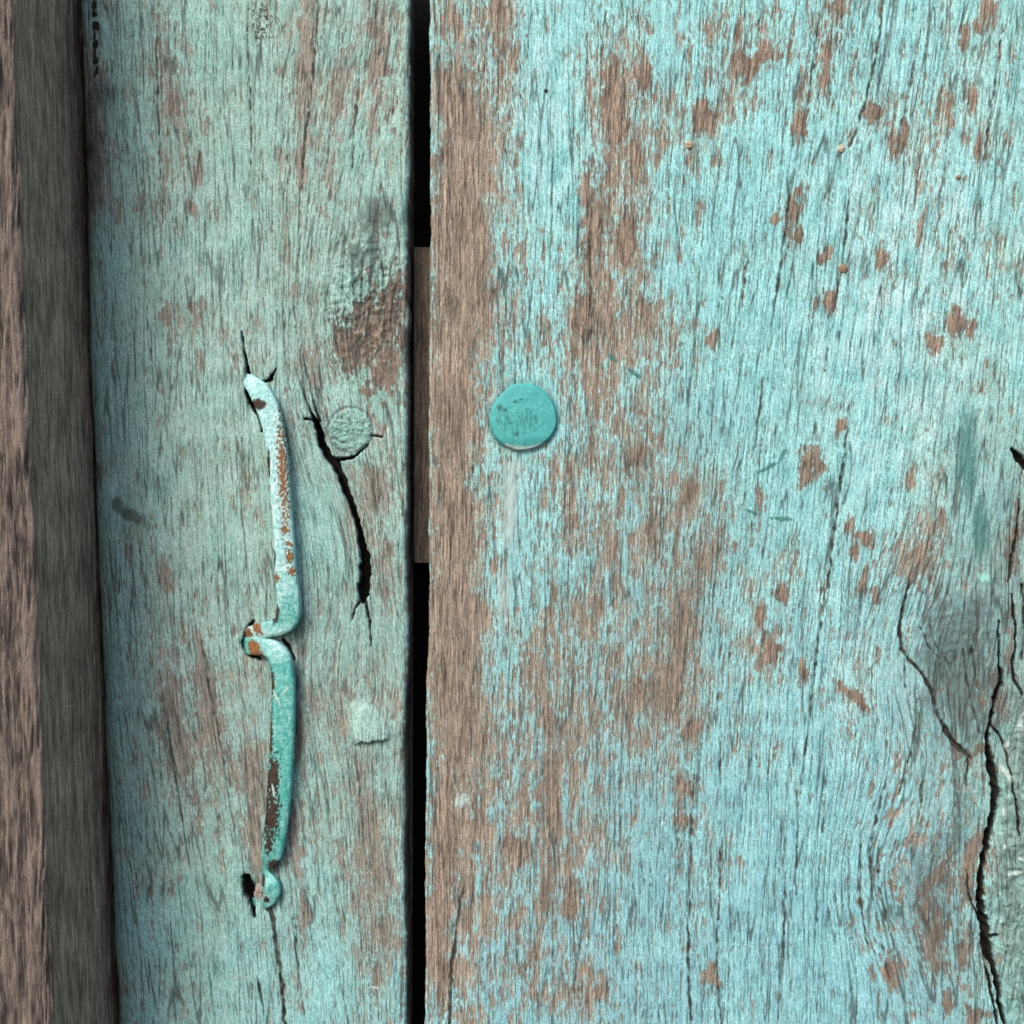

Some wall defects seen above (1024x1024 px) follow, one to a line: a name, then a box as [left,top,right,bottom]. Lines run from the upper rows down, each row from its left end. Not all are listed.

peeling [283,255,409,440]
corrosion [244,623,263,656]
corrosion [275,409,298,582]
crack [241,326,383,646]
peeling [425,0,528,1019]
peeling [753,581,811,689]
peeling [795,417,846,490]
peeling [844,506,956,612]
crack [1010,448,1024,470]
corrosion [263,667,282,856]
crack [849,500,1024,1024]
peeling [914,822,992,1024]